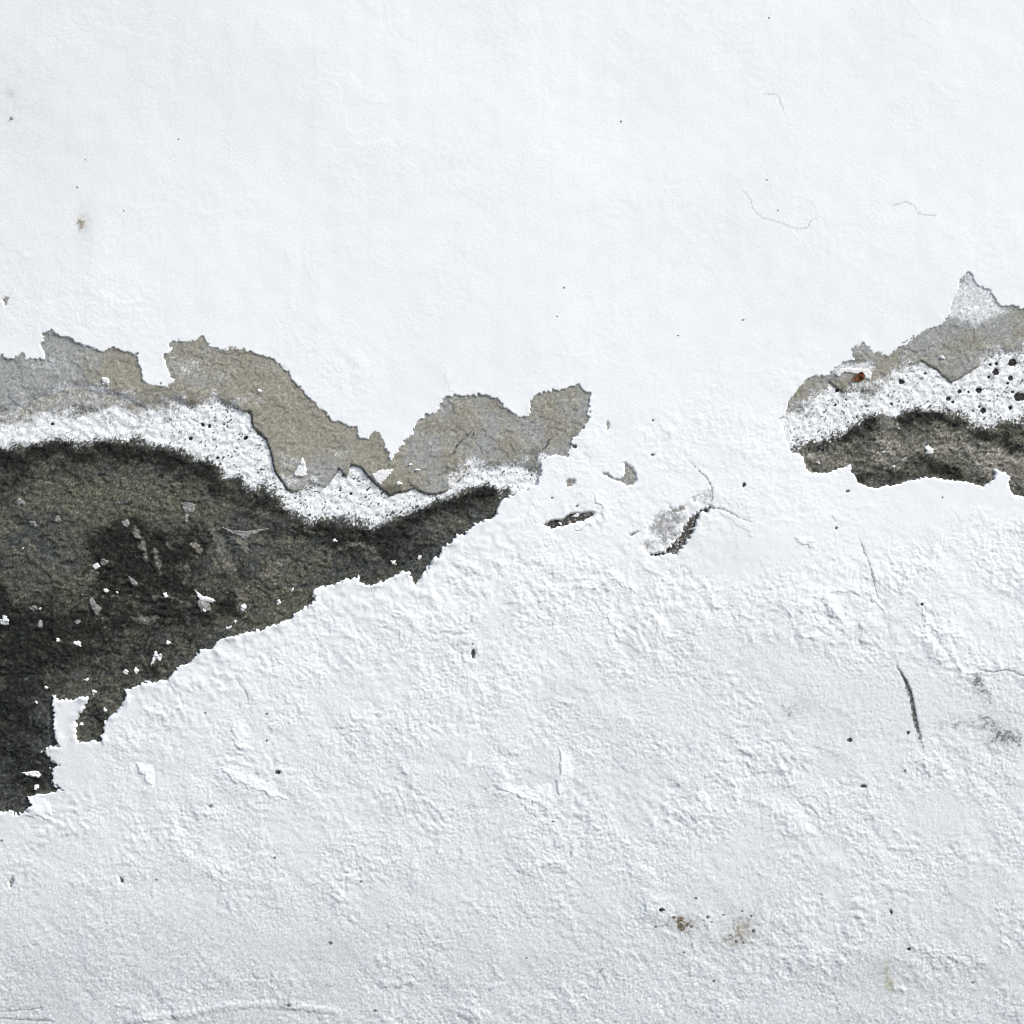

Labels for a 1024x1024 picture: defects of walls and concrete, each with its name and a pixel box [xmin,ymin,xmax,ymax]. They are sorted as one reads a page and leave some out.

peeling [780,272,1024,497]
peeling [603,463,637,486]
spalling [629,495,711,557]
peeling [0,329,593,815]
crack [898,668,924,750]